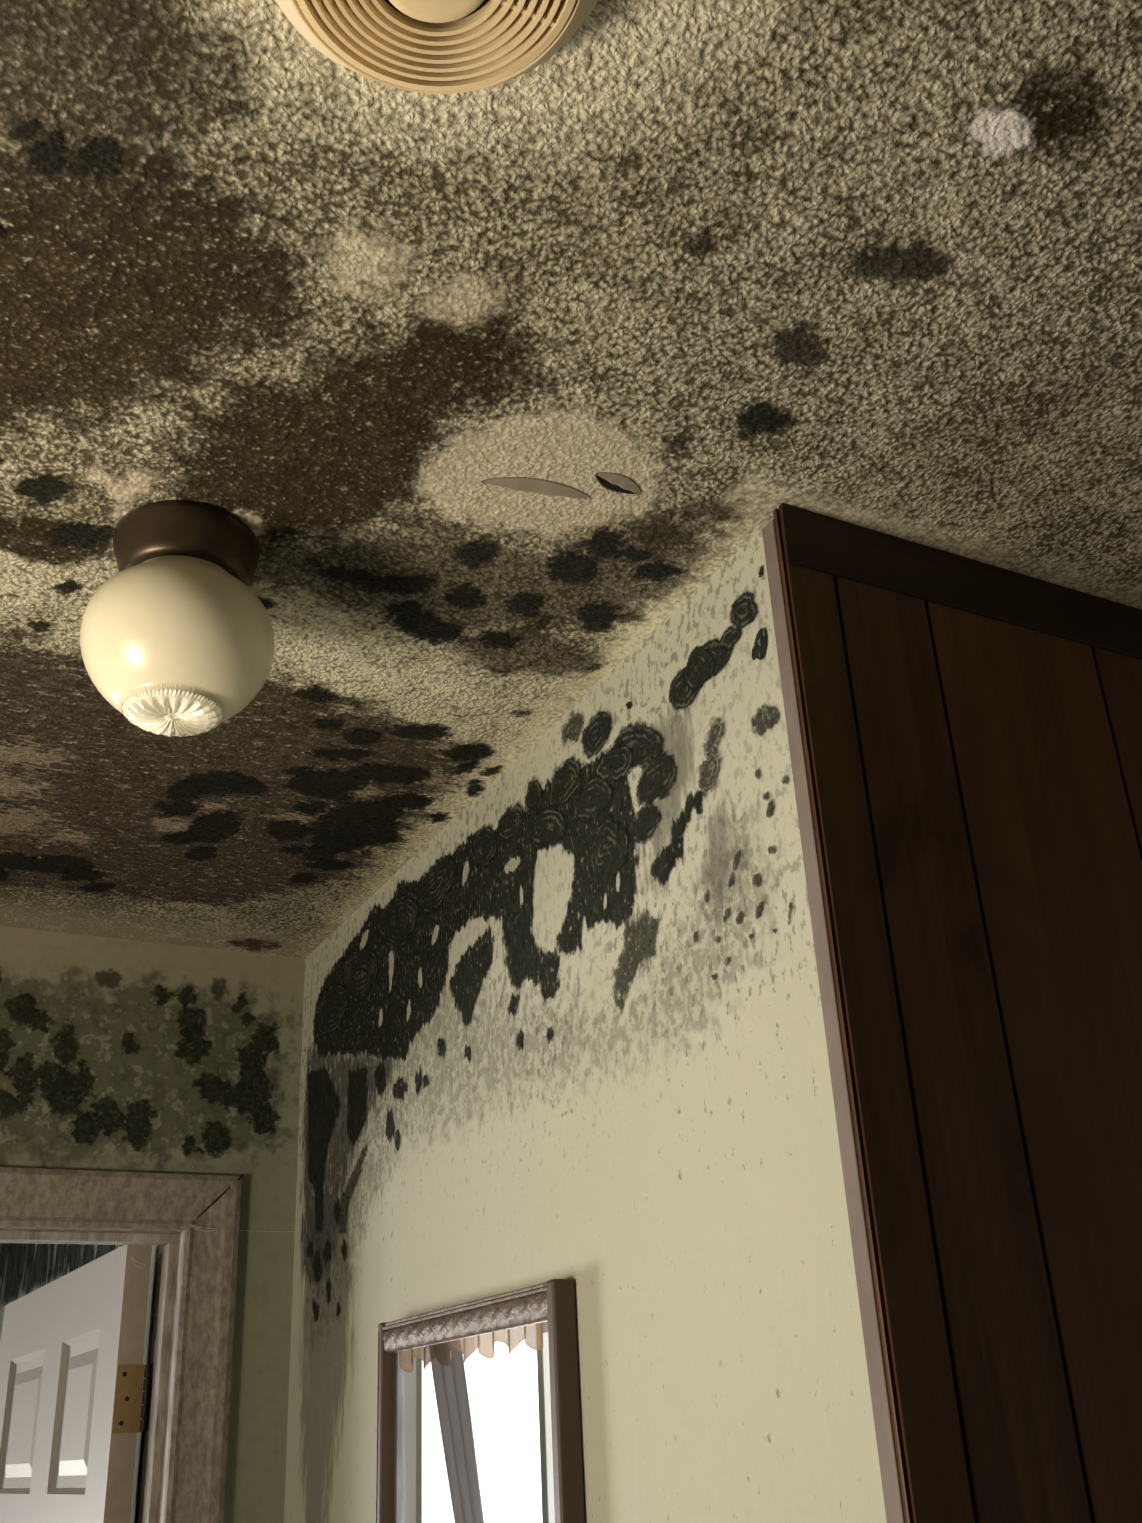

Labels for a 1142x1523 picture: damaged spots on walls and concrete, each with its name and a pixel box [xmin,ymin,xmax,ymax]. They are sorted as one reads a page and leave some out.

leakage [0,0,542,541]
leakage [0,473,114,598]
leakage [0,620,502,906]
leakage [306,539,553,678]
leakage [669,591,767,710]
leakage [751,704,779,736]
leakage [755,769,788,818]
leakage [712,851,765,980]
leakage [0,993,157,1152]
leakage [151,978,280,1158]
leakage [300,702,724,1322]
leakage [0,1243,123,1307]